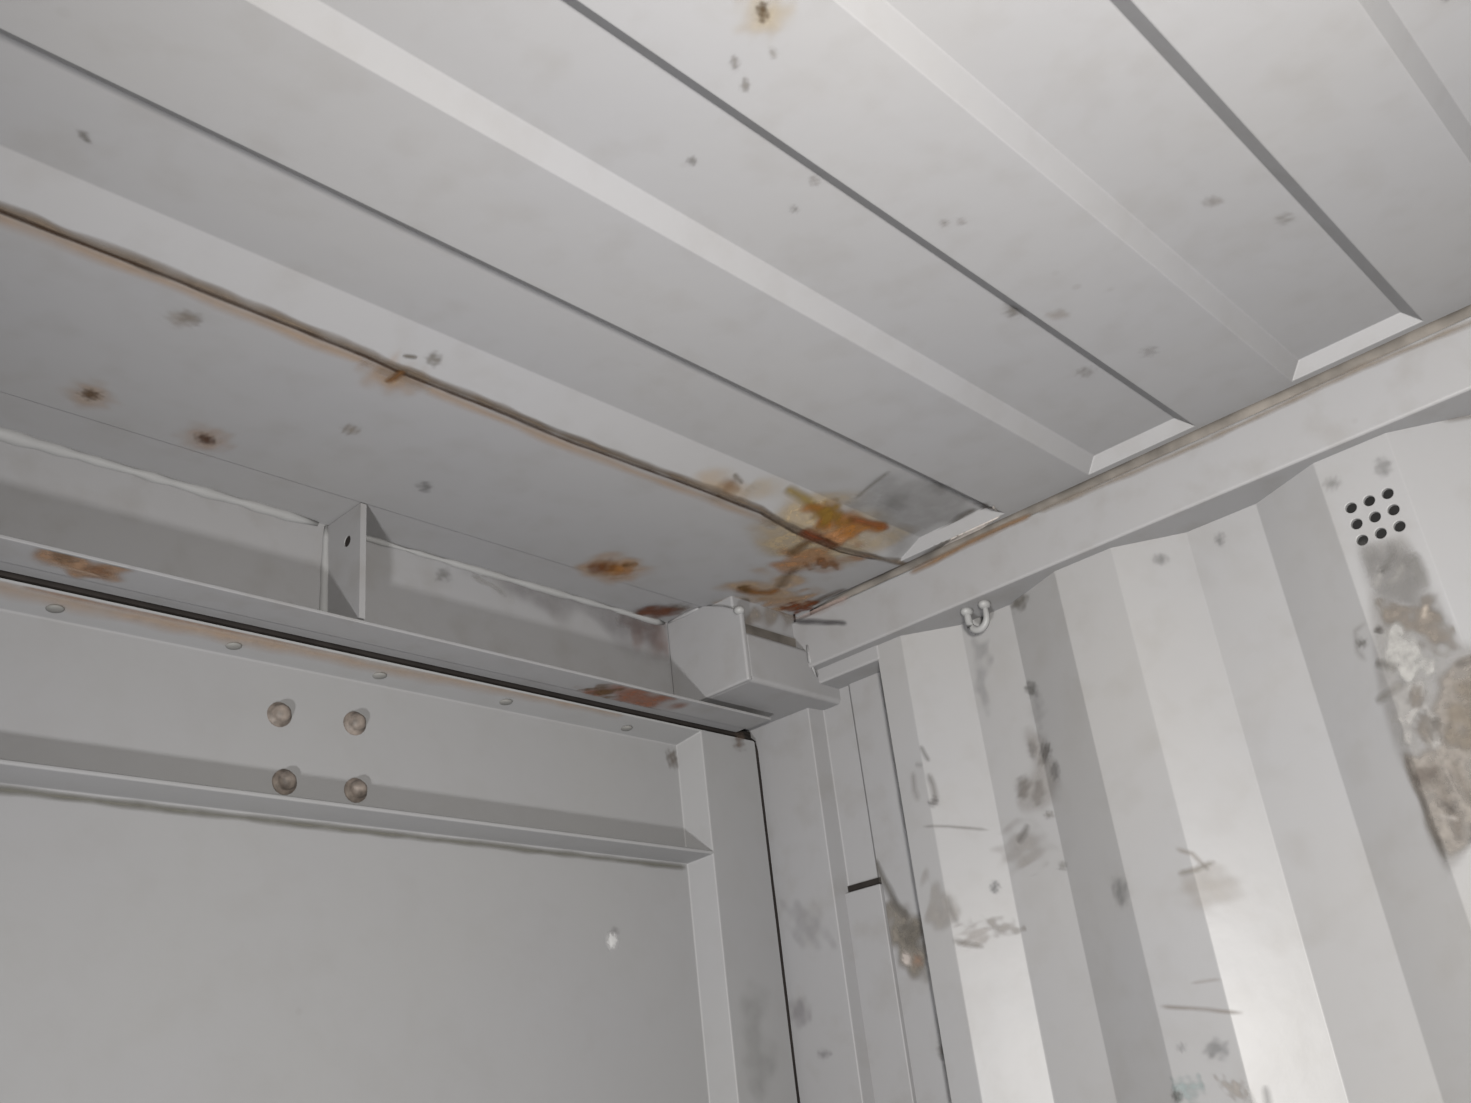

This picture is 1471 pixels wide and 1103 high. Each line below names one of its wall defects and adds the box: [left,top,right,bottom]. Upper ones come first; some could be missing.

corrosion [37,550,128,580]
corrosion [730,489,887,624]
corrosion [915,517,1026,571]
corrosion [585,685,674,707]